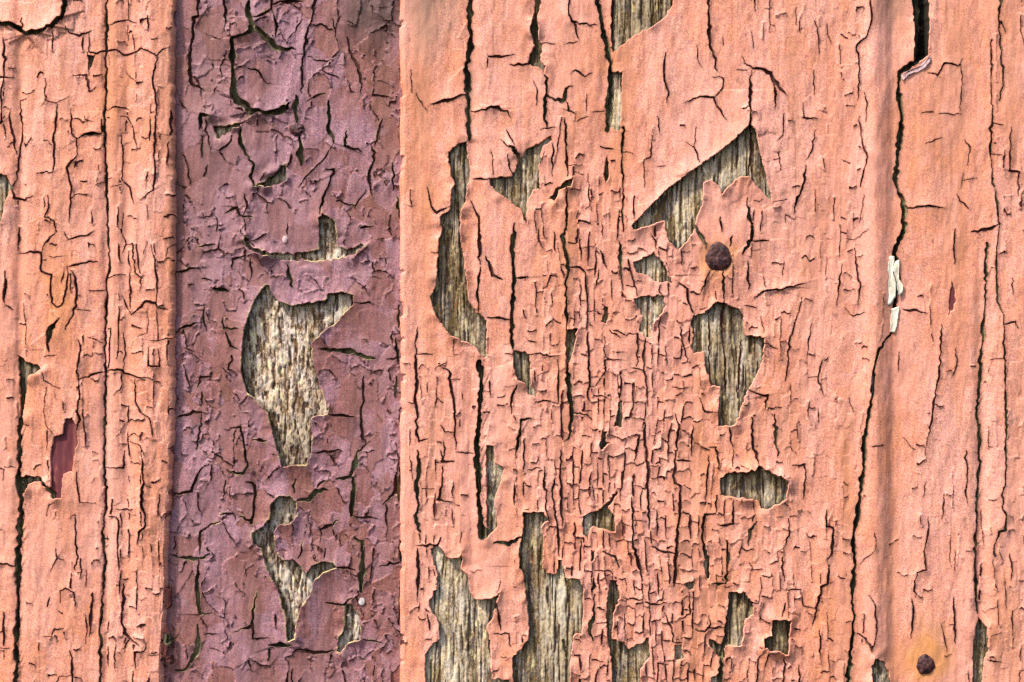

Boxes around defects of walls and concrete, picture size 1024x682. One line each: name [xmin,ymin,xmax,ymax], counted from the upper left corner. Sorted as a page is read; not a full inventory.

crack [0,0,466,682]
peeling [227,201,374,662]
peeling [425,129,619,365]
crack [284,62,898,682]
peeling [618,101,786,338]
crack [685,0,724,117]
peeling [691,293,777,434]
crack [751,0,873,317]
crack [907,62,1024,290]
peeling [413,437,660,682]
peeling [669,583,801,682]
rust [884,598,961,682]